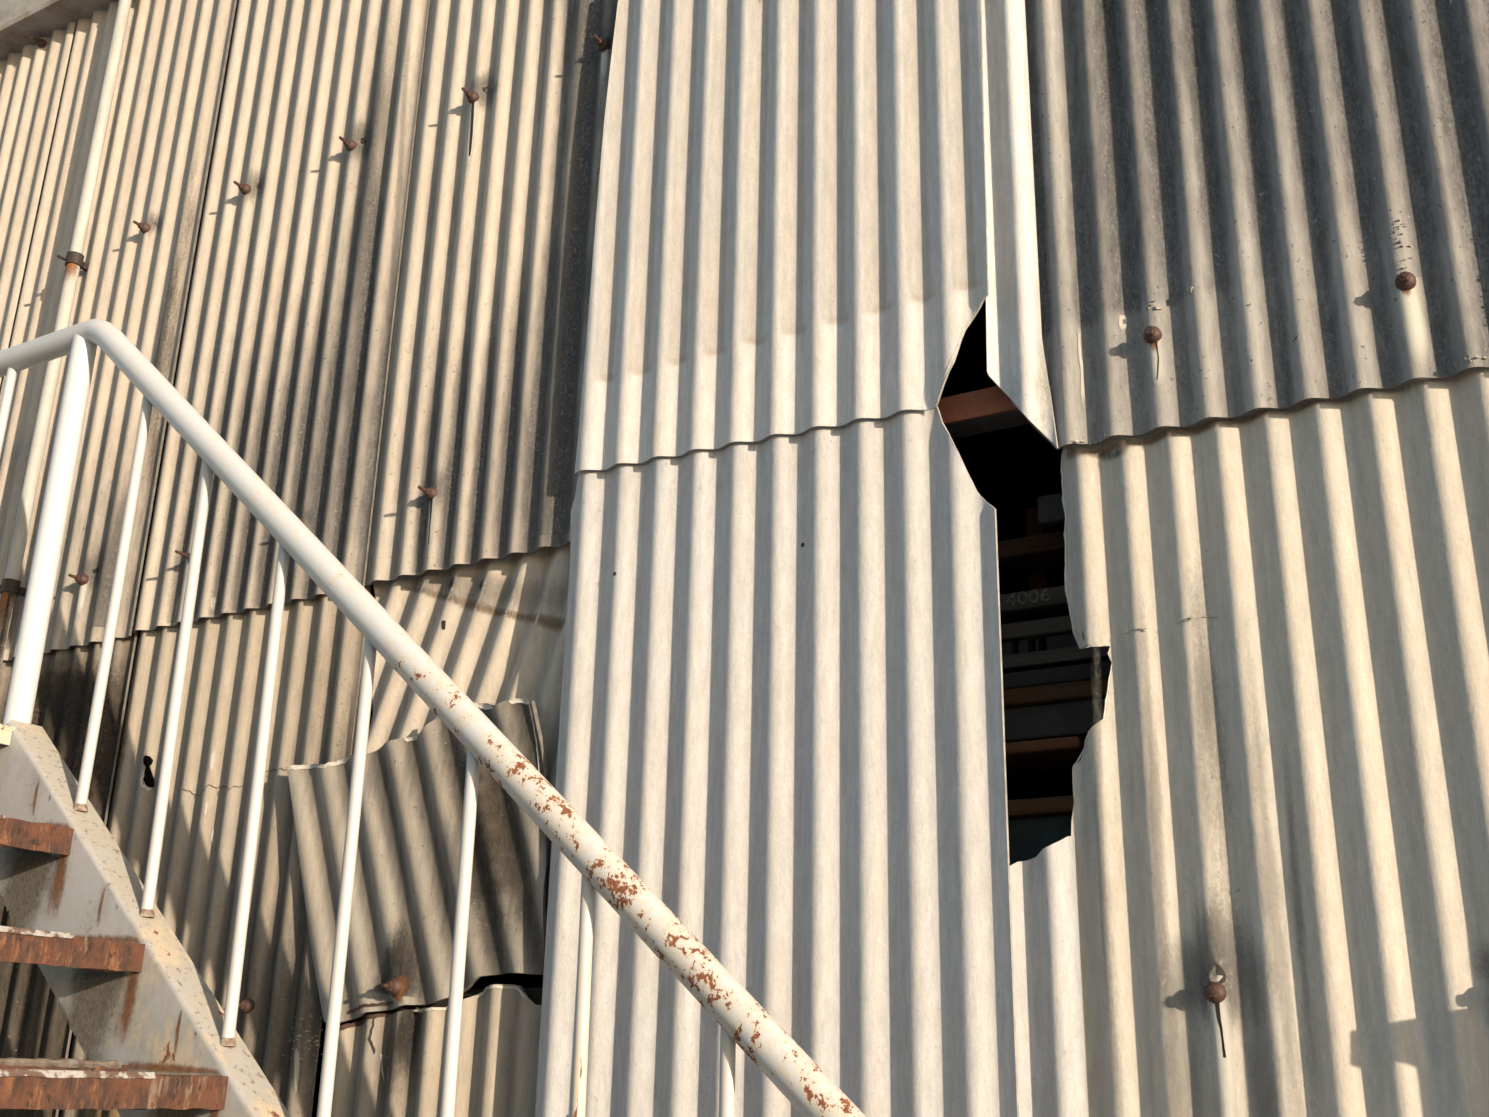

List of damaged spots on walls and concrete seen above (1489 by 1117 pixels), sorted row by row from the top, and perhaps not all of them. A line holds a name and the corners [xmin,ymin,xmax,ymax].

leakage [528,0,614,544]
spalling [935,302,981,405]
leakage [1397,278,1426,363]
leakage [416,371,464,571]
leakage [470,349,492,559]
spalling [1061,461,1113,802]
rust [3,847,67,928]
rust [67,968,139,1060]
rust [128,1012,222,1076]
crack [339,985,526,1054]
leakage [1181,921,1257,1117]
rust [153,1108,219,1117]